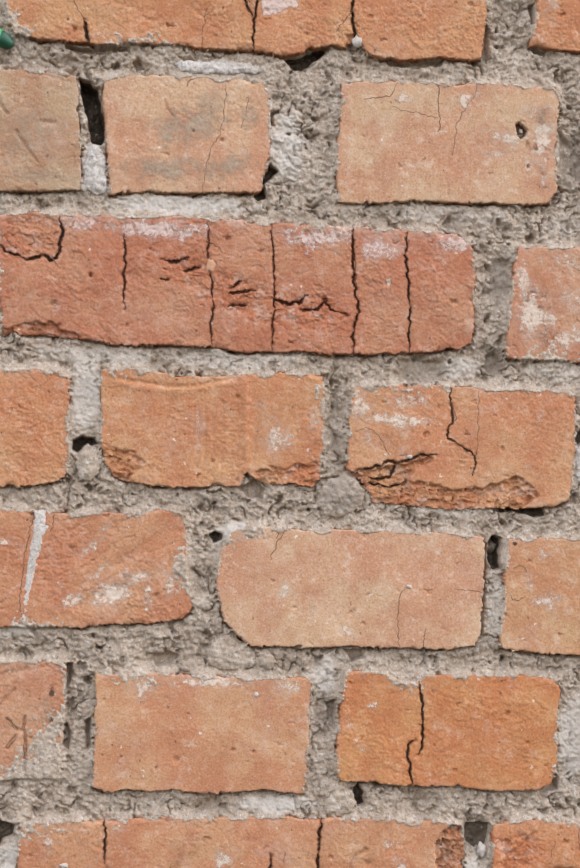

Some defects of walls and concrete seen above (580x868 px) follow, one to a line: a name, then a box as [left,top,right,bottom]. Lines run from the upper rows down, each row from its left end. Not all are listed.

crack [245,0,258,46]
spalling [4,216,61,257]
crack [269,224,277,350]
crack [351,226,360,353]
crack [404,232,412,353]
spalling [101,444,146,481]
spalling [255,462,322,487]
crack [351,386,480,491]
spalling [354,457,539,510]
crack [407,681,424,784]
crack [315,817,323,868]
spalling [435,825,465,868]